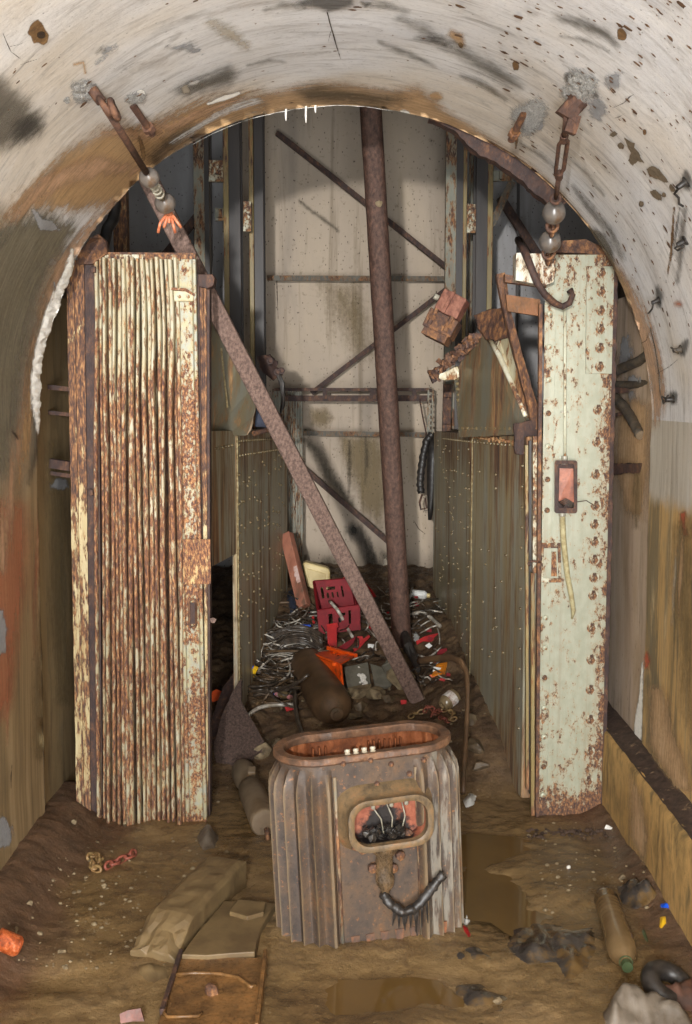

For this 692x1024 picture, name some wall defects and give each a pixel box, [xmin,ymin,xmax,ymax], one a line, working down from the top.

spalling [63,62,96,104]
spalling [510,99,548,137]
corrosion [498,1,595,103]
spalling [561,69,619,121]
corrosion [577,69,645,139]
corrosion [593,0,686,53]
leakage [0,70,555,679]
corrosion [0,504,23,712]